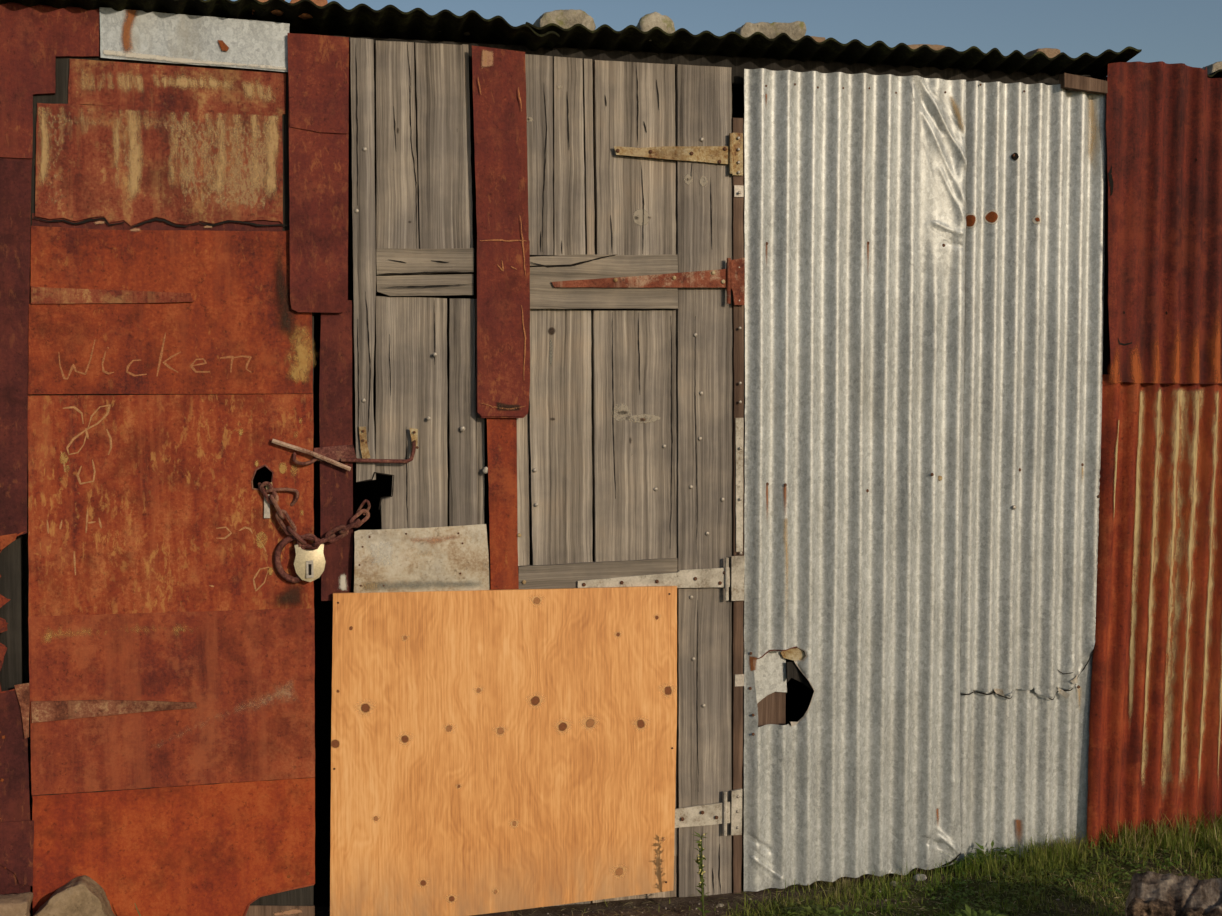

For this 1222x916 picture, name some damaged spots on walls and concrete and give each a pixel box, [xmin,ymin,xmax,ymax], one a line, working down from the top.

corrosion [478,50,493,93]
corrosion [966,210,999,228]
corrosion [480,217,526,276]
corrosion [0,157,292,551]
corrosion [1078,61,1222,849]
crack [960,691,1015,699]
crack [1049,651,1094,700]
corrosion [0,690,30,822]
corrosion [0,865,31,916]